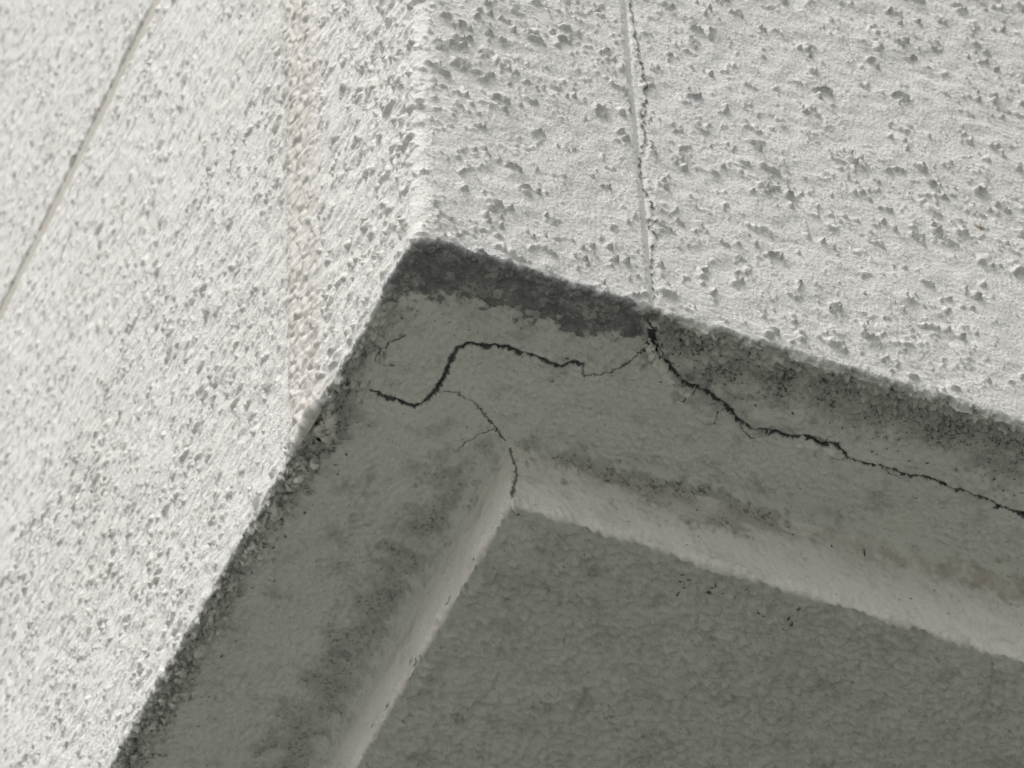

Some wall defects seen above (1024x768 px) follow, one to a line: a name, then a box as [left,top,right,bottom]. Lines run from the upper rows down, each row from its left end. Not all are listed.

damp [321,338,380,412]
crack [370,1,1024,518]
damp [380,237,1024,496]
damp [111,424,348,768]